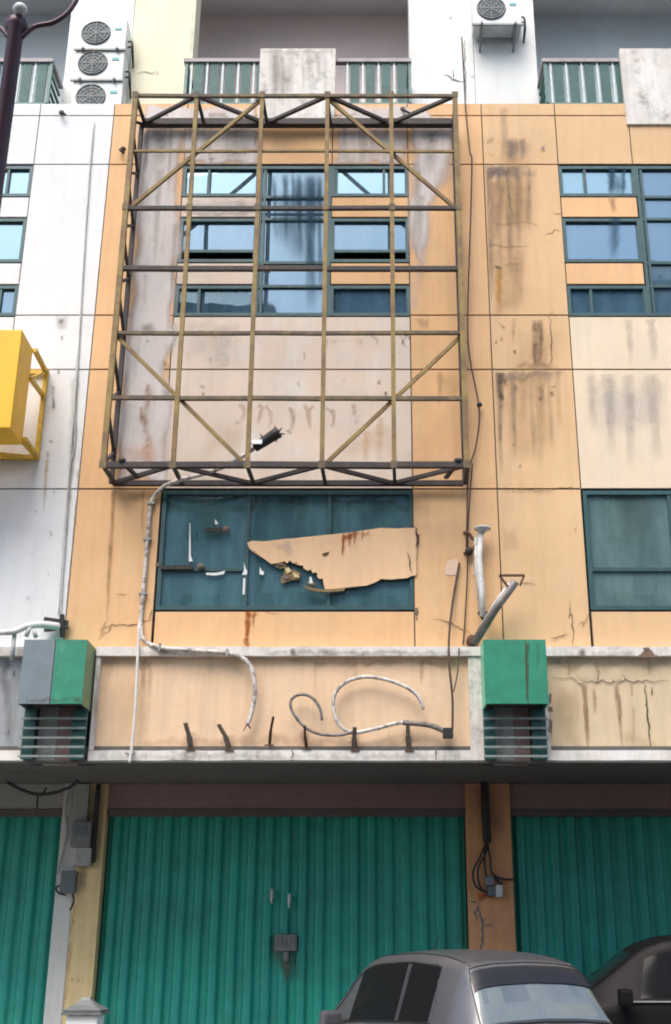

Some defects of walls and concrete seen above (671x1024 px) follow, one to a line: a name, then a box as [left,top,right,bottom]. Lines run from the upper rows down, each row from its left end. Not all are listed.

water stain [284,176,321,260]
peeling [247,527,420,593]
crack [554,601,589,645]
crack [556,671,662,746]
crack [470,901,494,949]